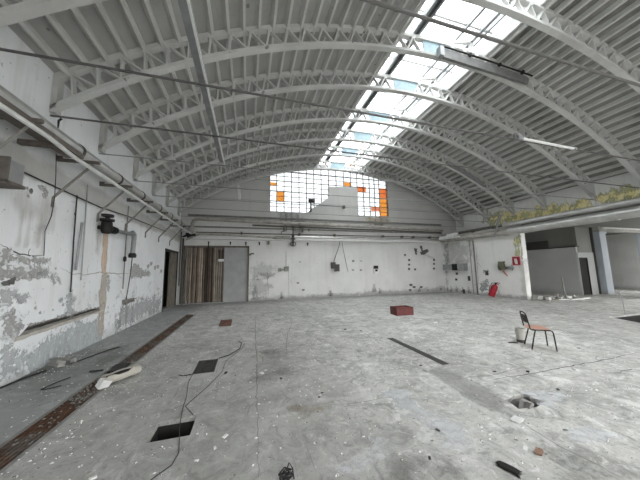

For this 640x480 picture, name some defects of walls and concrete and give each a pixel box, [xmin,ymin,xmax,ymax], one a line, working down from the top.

peeling [0,248,52,291]
rust [98,234,108,337]
spalling [130,262,162,279]
spalling [0,300,24,343]
peeling [10,317,104,374]
crack [448,353,635,383]
crack [217,320,295,478]